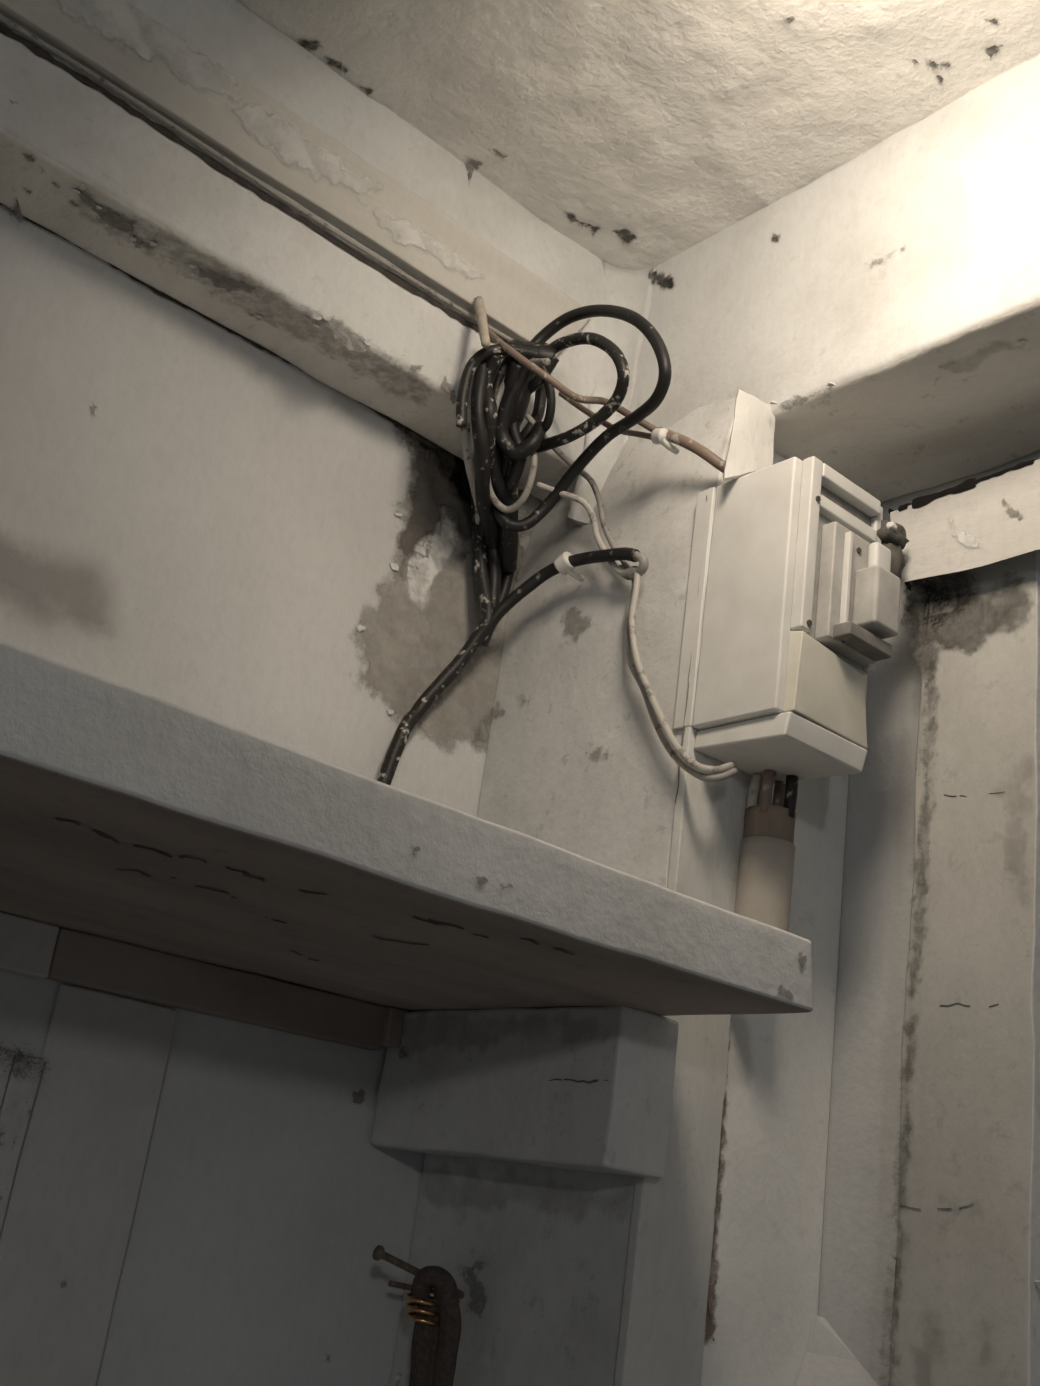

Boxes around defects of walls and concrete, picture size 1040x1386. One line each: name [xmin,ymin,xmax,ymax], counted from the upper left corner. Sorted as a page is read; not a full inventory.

spalling [298,40,347,73]
spalling [51,182,157,250]
spalling [190,264,255,293]
peeling [509,489,533,594]
peeling [356,425,509,752]
crack [53,818,266,899]
crack [373,916,575,955]